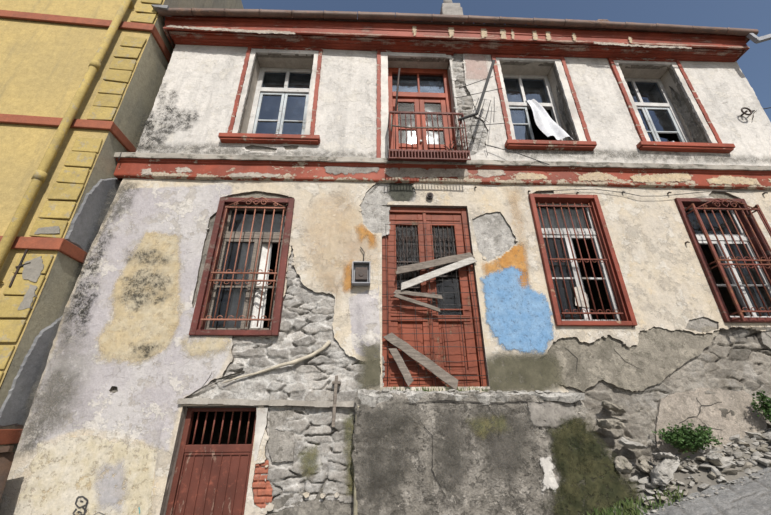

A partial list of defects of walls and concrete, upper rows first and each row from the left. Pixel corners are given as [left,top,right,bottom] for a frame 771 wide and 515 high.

peeling [166,25,295,35]
water stain [138,87,271,155]
spalling [449,54,488,156]
spalling [324,166,547,236]
peeling [631,173,692,183]
peeling [706,175,760,199]
water stain [121,251,169,309]
spalling [183,242,385,515]
spalling [528,317,771,464]
crack [680,398,720,430]
peeling [14,435,157,515]
water stain [555,419,594,500]